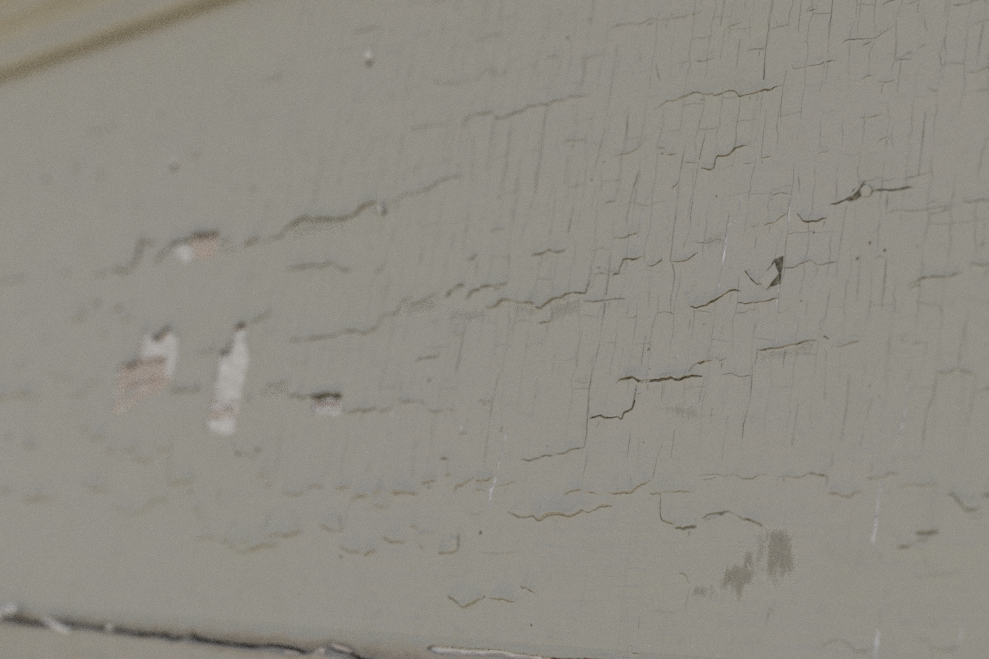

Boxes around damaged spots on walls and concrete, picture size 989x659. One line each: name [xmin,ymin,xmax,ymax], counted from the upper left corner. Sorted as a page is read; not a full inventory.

crack [113,227,170,275]
peeling [168,221,225,265]
crack [241,169,465,276]
crack [445,0,860,524]
crack [880,256,989,309]
crack [287,290,412,344]
peeling [112,315,182,416]
peeling [204,311,252,438]
peeling [310,382,347,419]
crack [674,497,767,538]
crack [870,475,989,552]
crack [1,617,308,653]